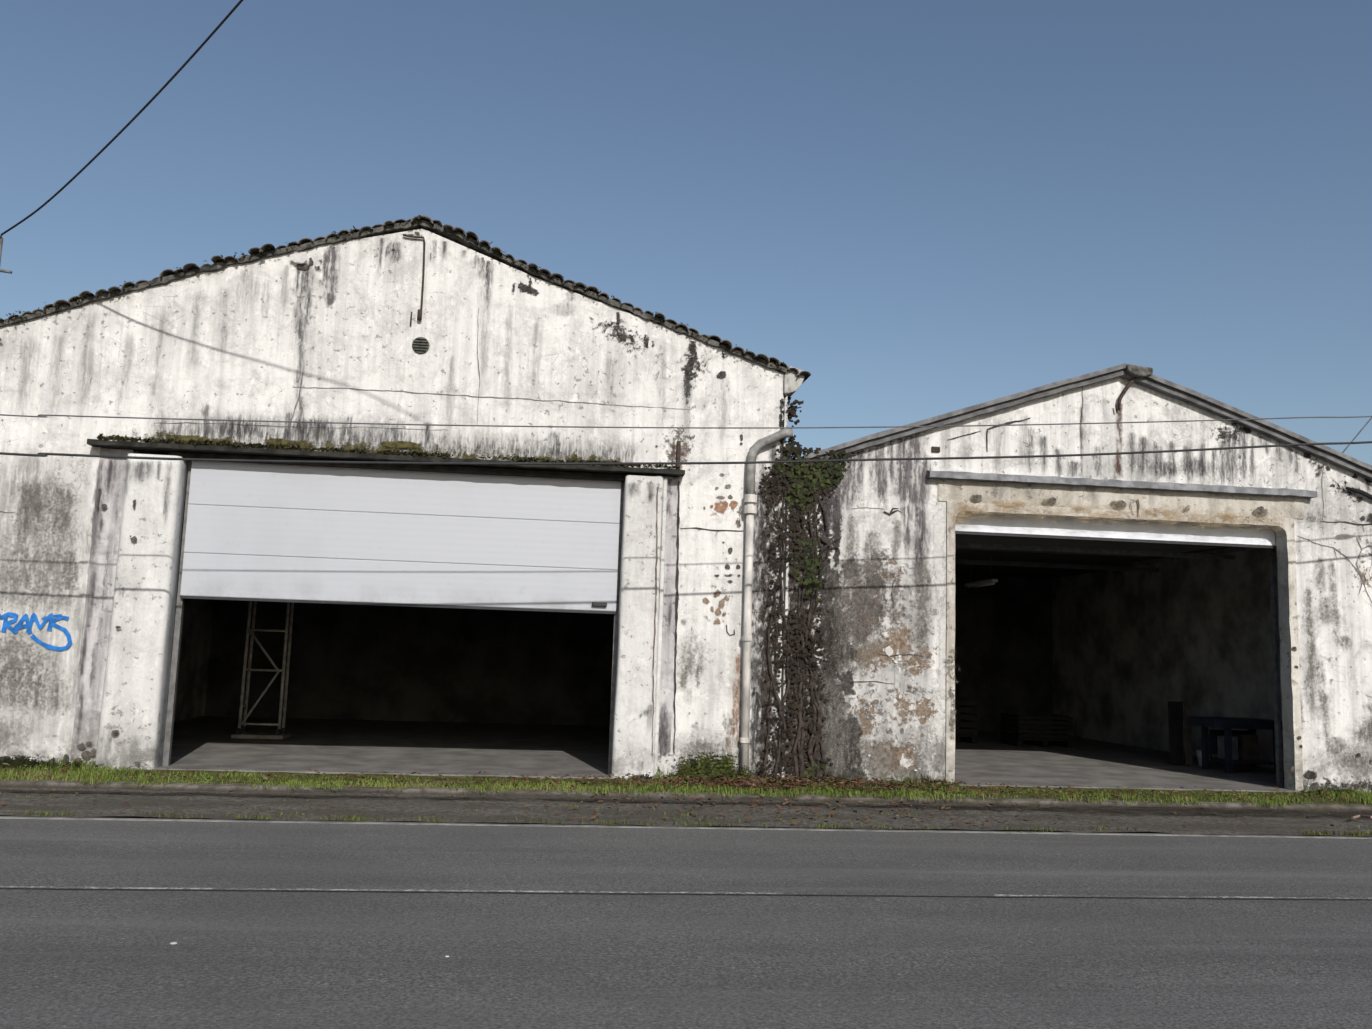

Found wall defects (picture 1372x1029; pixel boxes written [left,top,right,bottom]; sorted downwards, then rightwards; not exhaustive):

water stain [296,246,337,368]
water stain [681,338,726,404]
water stain [161,404,630,460]
water stain [1028,435,1077,475]
flaking render [703,473,741,527]
crack [1297,464,1372,602]
peeling [702,542,740,624]
water stain [681,648,702,686]
peeling [832,509,946,782]
water stain [644,707,734,765]